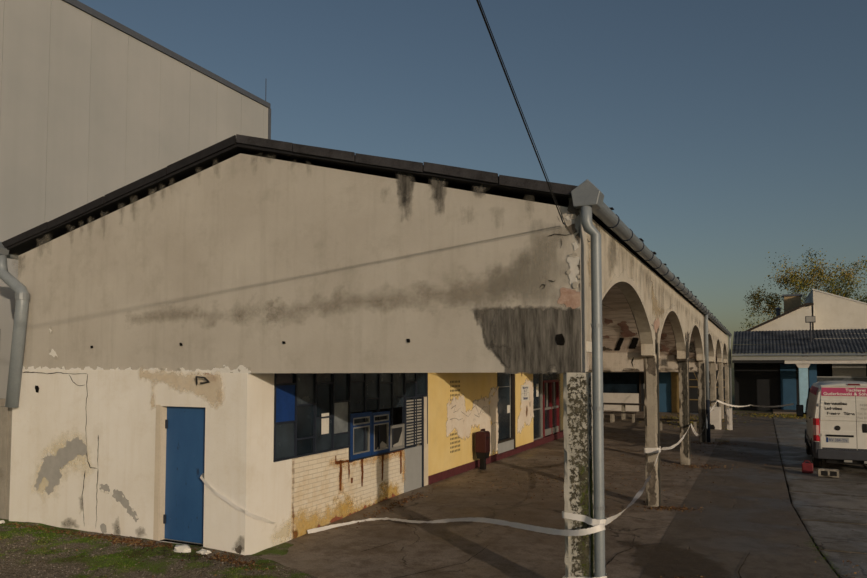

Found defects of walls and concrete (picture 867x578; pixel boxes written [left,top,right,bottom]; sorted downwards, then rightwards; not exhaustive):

leakage [398,172,414,206]
leakage [431,177,446,210]
flaking render [557,198,581,309]
leakage [474,306,581,374]
flaking render [591,319,637,351]
spalling [623,287,669,376]
peeling [446,387,499,455]
peeling [517,378,534,433]
peeling [34,437,87,495]
peeling [99,484,138,521]
corrosion [335,450,404,491]
spalling [567,375,594,577]